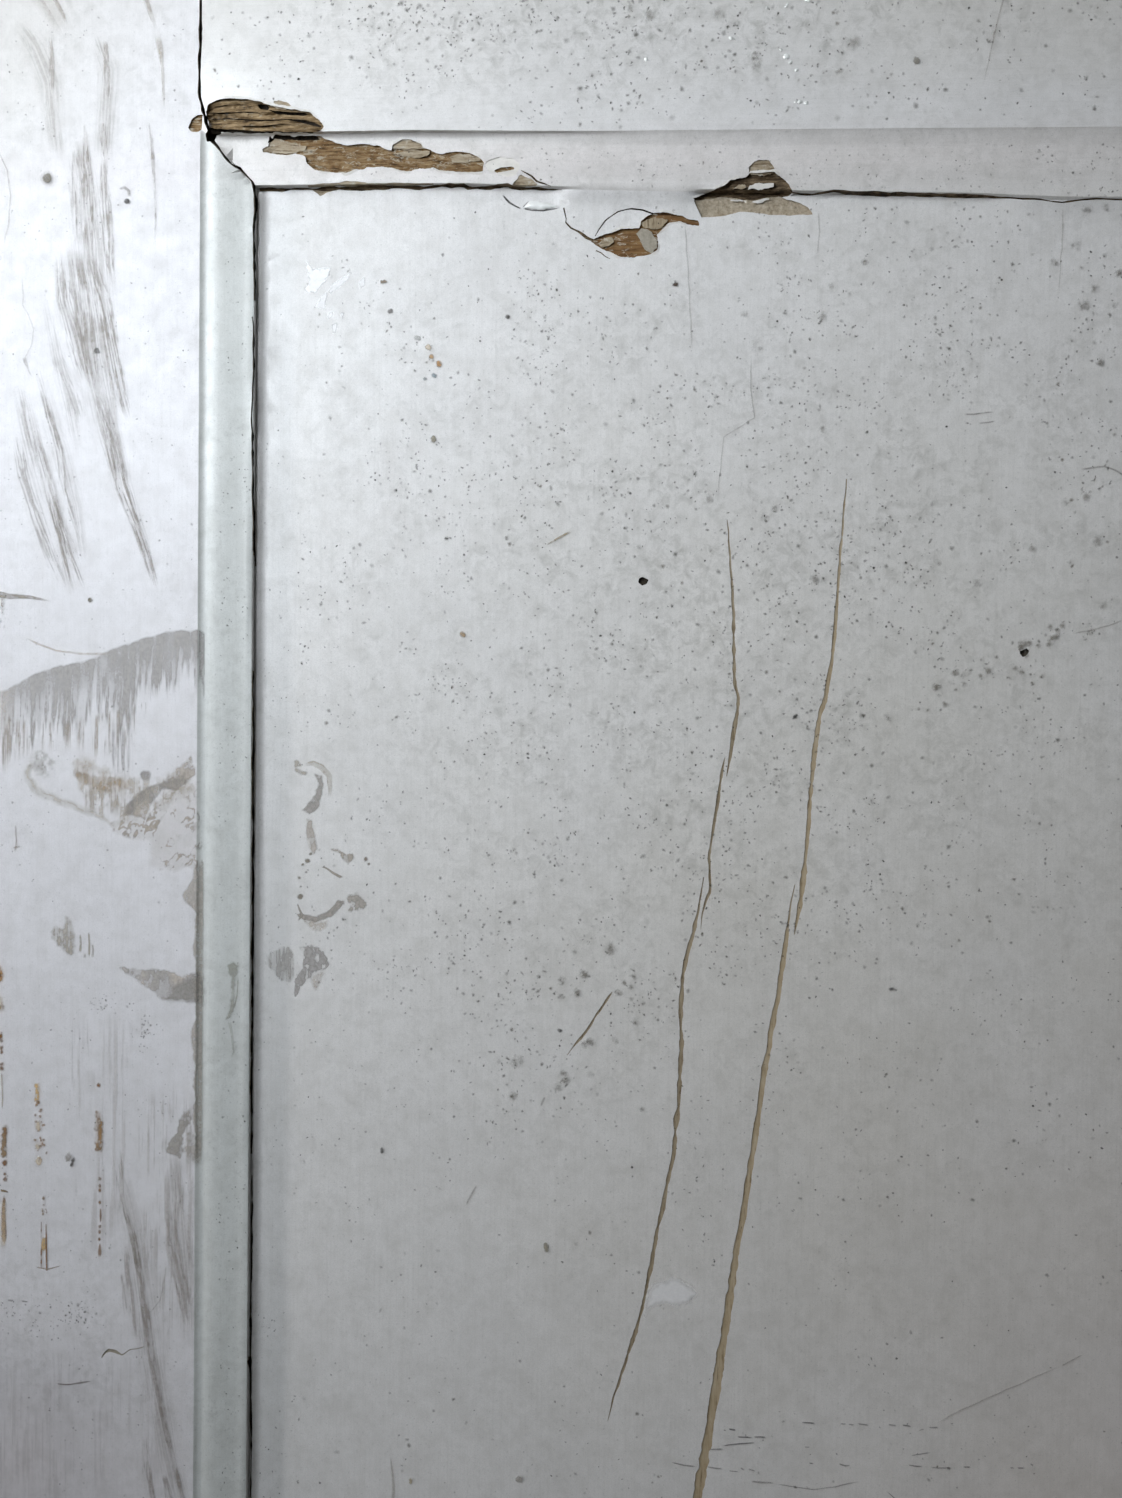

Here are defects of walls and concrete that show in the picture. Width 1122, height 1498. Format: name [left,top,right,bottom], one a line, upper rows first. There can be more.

spalling [188,96,537,187]
spalling [563,160,813,259]
crack [790,189,1122,203]
crack [198,0,562,566]
water stain [76,764,199,868]
crack [608,520,740,1419]
crack [693,479,847,1498]
corrosion [34,1084,47,1165]
corrosion [38,1197,58,1271]